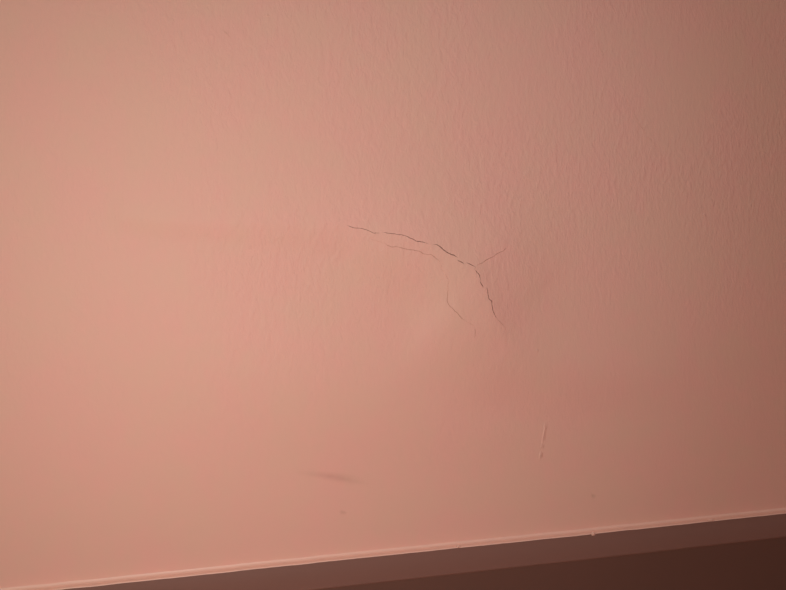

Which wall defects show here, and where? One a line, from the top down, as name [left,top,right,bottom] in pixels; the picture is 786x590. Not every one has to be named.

crack [350,226,506,333]